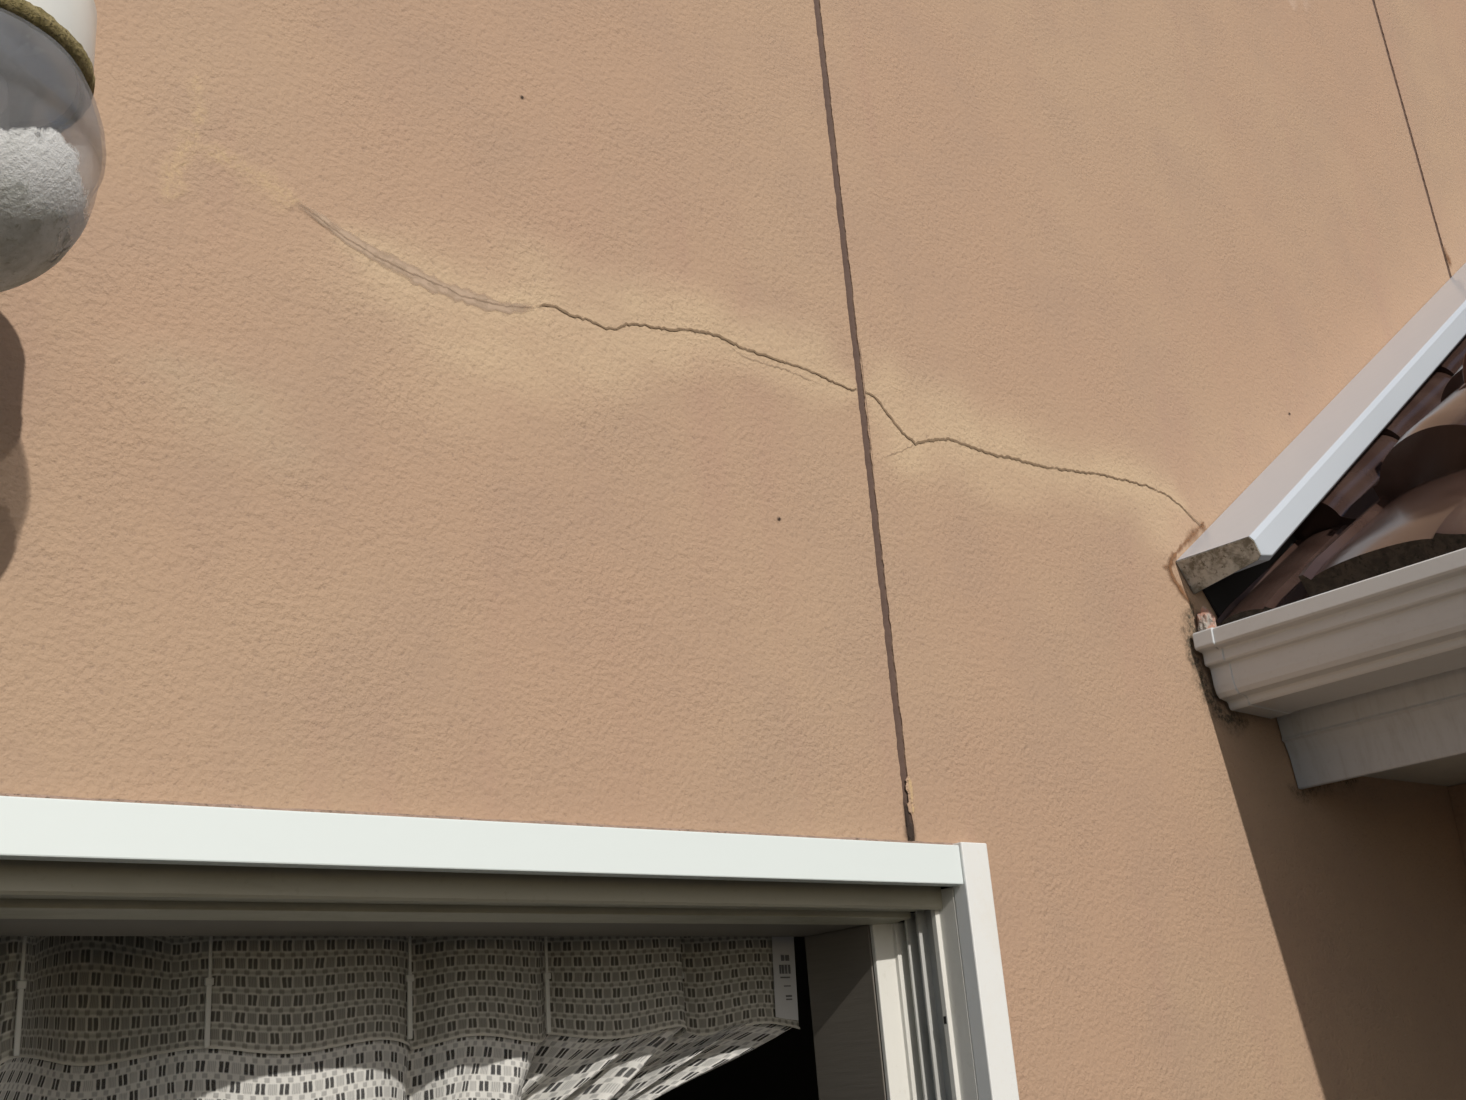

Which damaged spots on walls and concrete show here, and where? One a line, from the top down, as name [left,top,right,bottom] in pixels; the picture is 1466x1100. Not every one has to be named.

crack [307,209,1201,525]